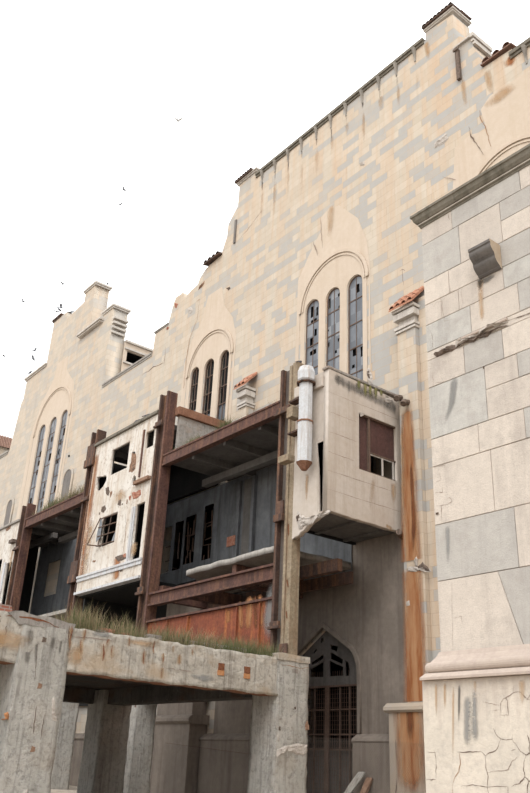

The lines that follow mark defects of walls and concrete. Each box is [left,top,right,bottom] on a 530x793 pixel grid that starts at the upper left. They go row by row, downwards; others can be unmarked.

damp [448,380,456,413]
spalling [105,487,141,506]
rust [392,410,425,702]
rust [226,593,272,628]
spalling [276,726,307,757]
rust [397,712,423,789]
damp [458,687,477,741]
crack [427,686,530,791]